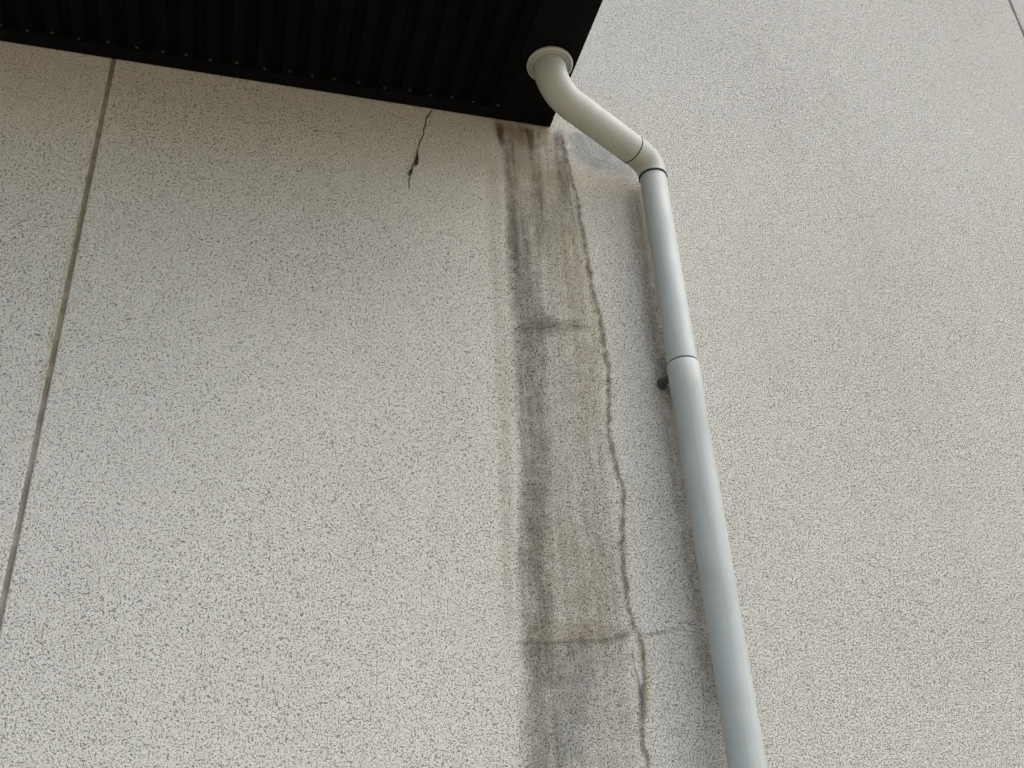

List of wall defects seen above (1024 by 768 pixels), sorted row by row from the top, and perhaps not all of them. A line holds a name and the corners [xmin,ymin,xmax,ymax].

crack [408,111,432,187]
crack [562,139,649,758]